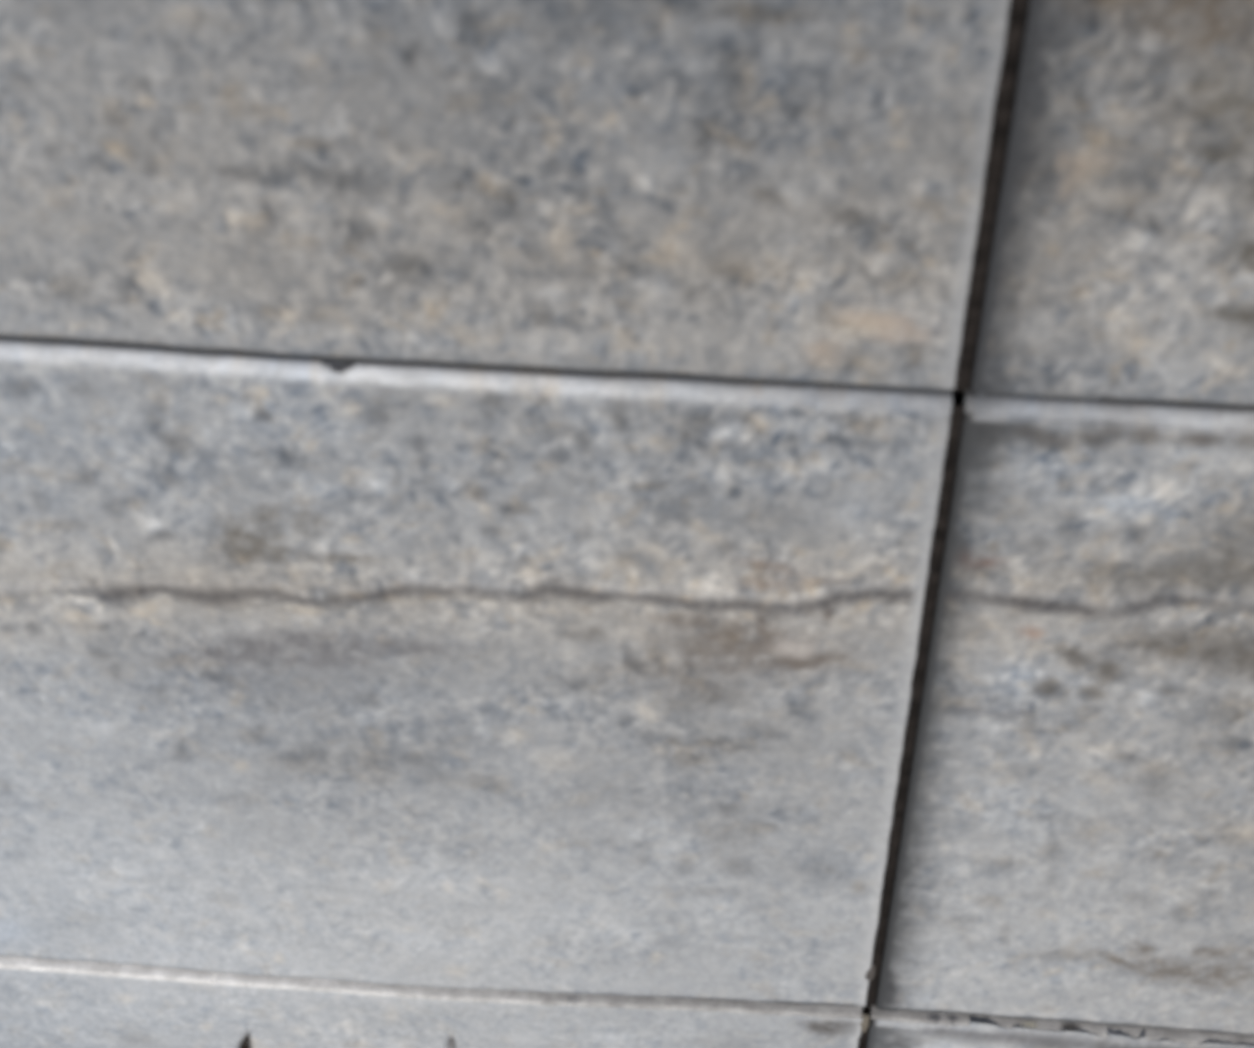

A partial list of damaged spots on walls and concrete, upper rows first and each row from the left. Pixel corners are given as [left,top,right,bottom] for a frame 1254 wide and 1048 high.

crack [0,572,1254,625]